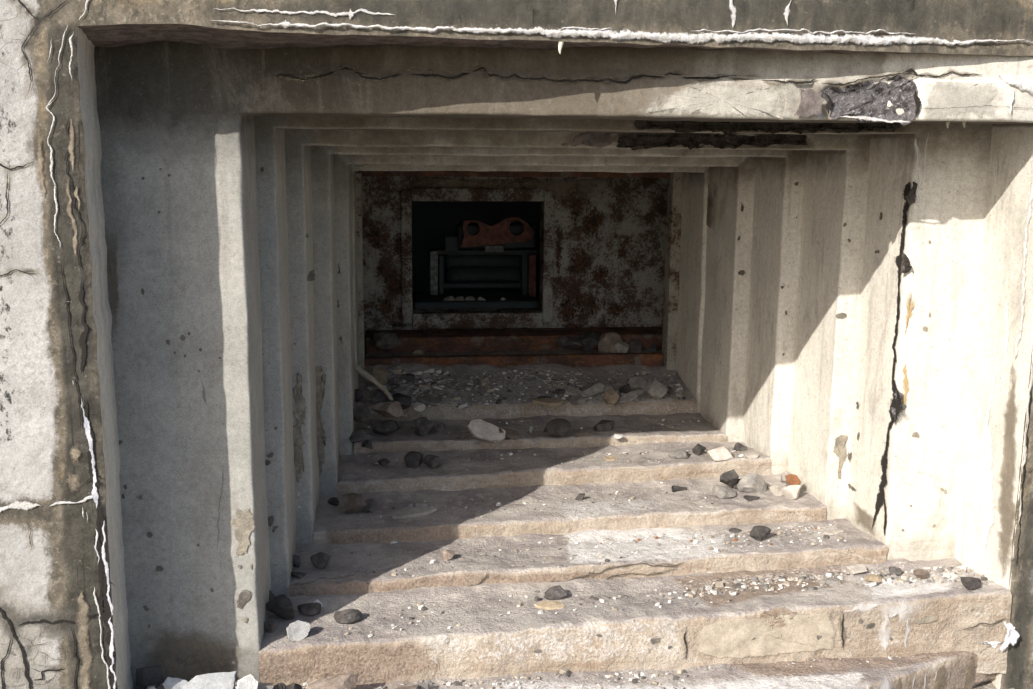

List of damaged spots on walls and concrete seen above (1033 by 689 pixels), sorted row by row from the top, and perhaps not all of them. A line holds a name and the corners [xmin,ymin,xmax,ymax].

crack [16,0,76,89]
crack [275,65,980,88]
spalling [562,74,996,150]
corrosion [554,192,623,328]
crack [0,119,119,689]
crack [872,182,910,536]
water stain [978,161,1033,566]
crack [1012,372,1033,562]
water stain [981,621,1020,652]